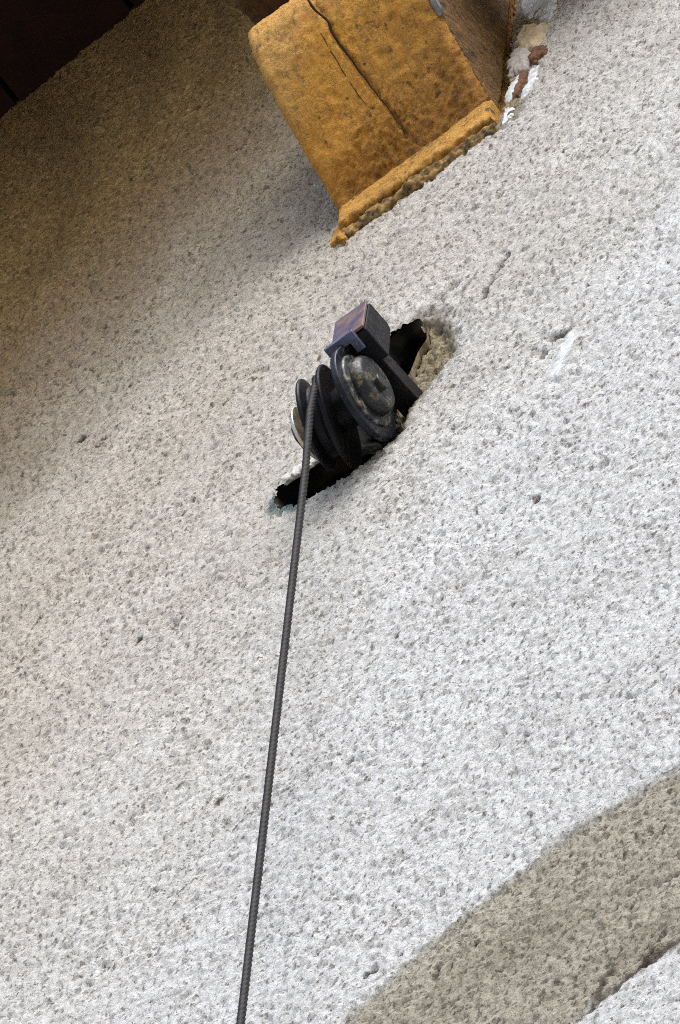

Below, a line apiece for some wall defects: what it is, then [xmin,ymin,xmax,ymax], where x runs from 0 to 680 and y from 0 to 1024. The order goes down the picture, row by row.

spalling [273,318,455,509]